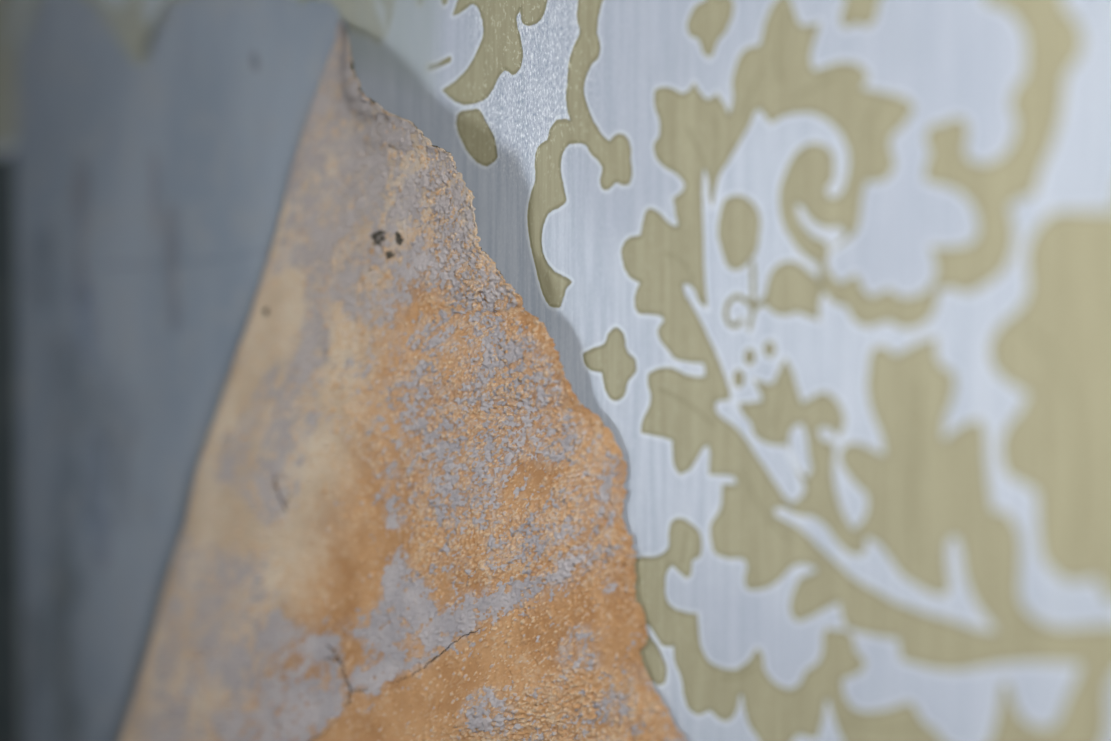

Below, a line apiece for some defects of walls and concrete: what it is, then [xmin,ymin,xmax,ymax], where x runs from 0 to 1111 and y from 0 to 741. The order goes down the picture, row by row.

spalling [370,230,404,259]
flaking render [15,0,348,741]
peeling [344,309,593,696]
peeling [592,450,619,503]
peeling [465,686,514,734]